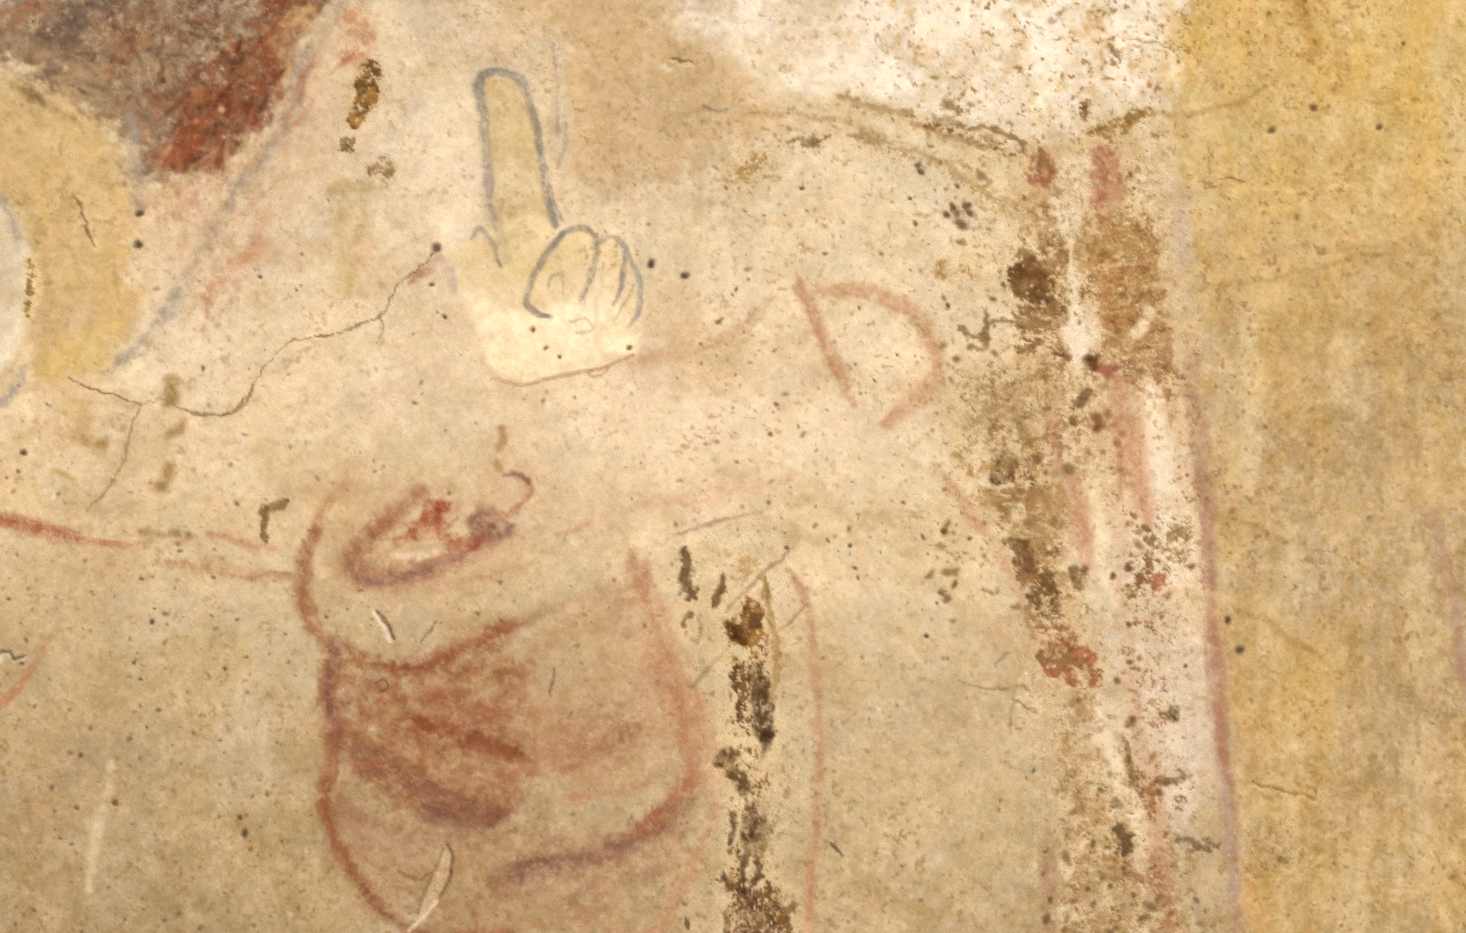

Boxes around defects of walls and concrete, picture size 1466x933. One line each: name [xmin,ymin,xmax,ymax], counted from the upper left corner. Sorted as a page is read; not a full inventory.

crack [66,376,156,417]
crack [191,251,434,419]
crack [84,454,128,514]
flaking render [706,79,1306,933]
peeling [677,545,801,933]